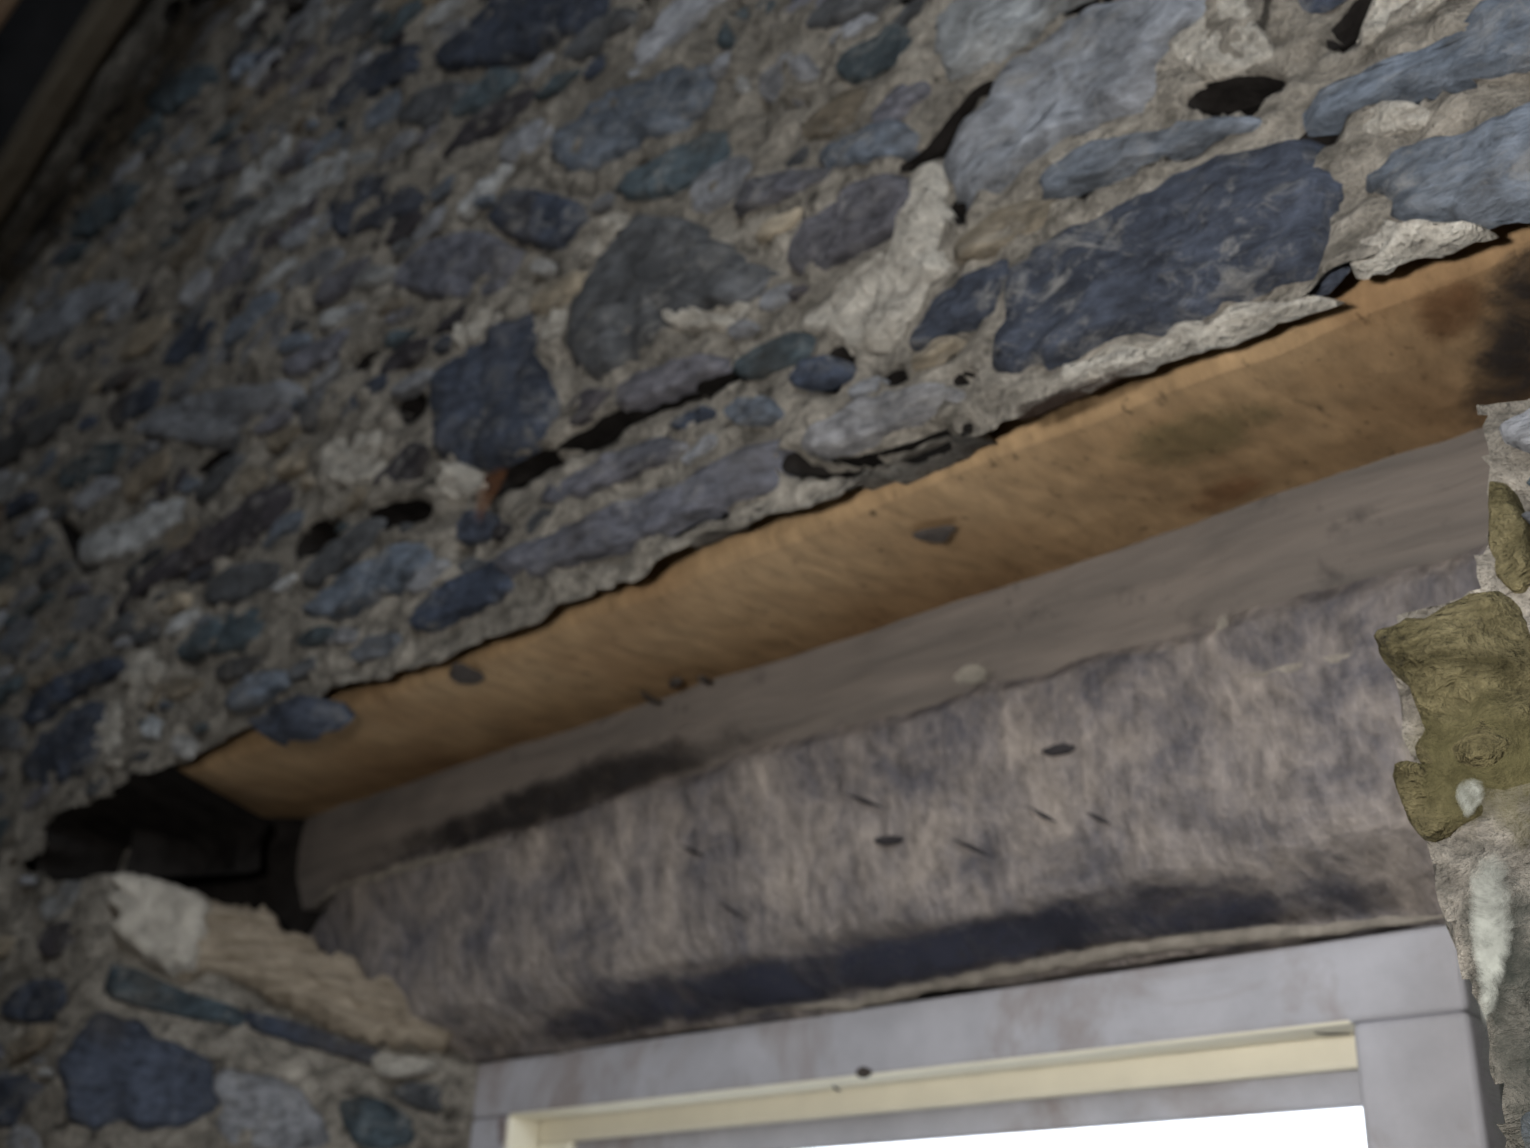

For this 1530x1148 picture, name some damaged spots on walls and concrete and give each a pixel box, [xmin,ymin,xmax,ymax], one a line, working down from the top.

spalling [33,764,323,936]
water stain [551,879,1276,1041]